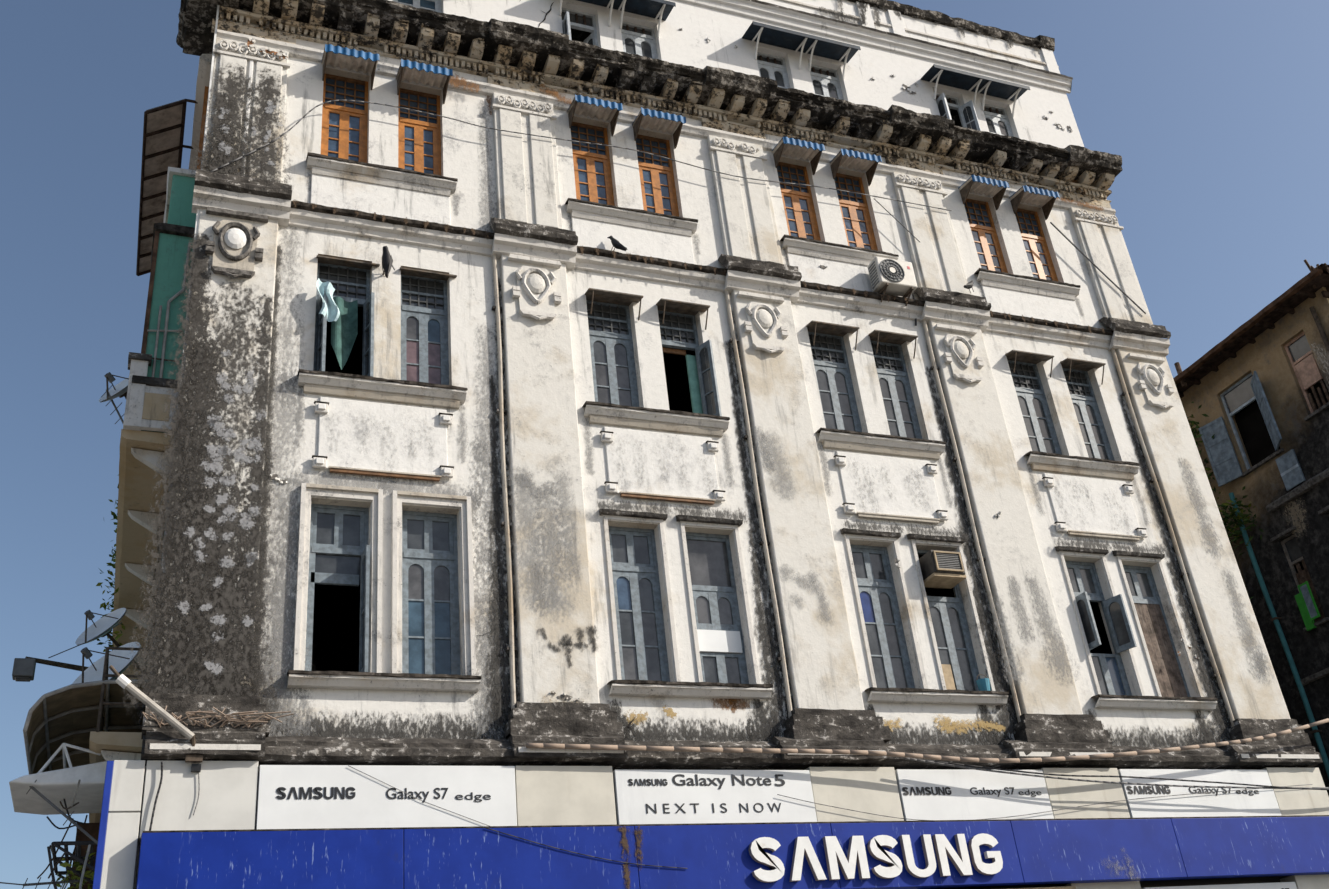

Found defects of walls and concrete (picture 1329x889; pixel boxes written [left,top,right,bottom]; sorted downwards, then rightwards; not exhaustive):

water stain [819,0,880,27]
water stain [192,65,291,197]
water stain [424,101,496,238]
water stain [124,229,311,736]
water stain [459,279,580,738]
water stain [585,418,593,474]
water stain [723,310,794,734]
water stain [926,343,1073,741]
water stain [538,625,598,667]